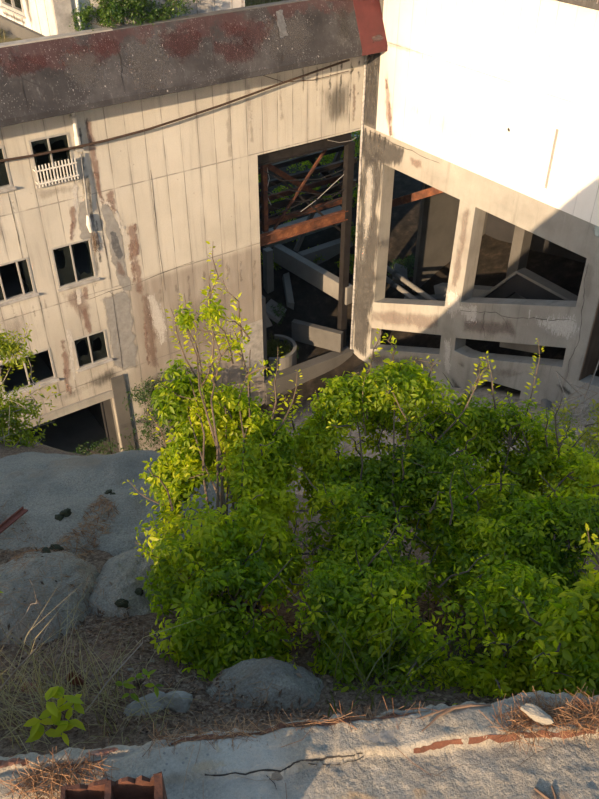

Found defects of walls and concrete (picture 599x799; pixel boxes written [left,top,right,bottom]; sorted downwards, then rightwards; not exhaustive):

leakage [329,81,345,117]
rust [87,122,114,209]
leakage [341,53,404,357]
rust [129,224,141,292]
crack [461,263,589,379]
peeling [527,310,581,340]
rust [62,341,71,393]
crack [205,753,364,789]